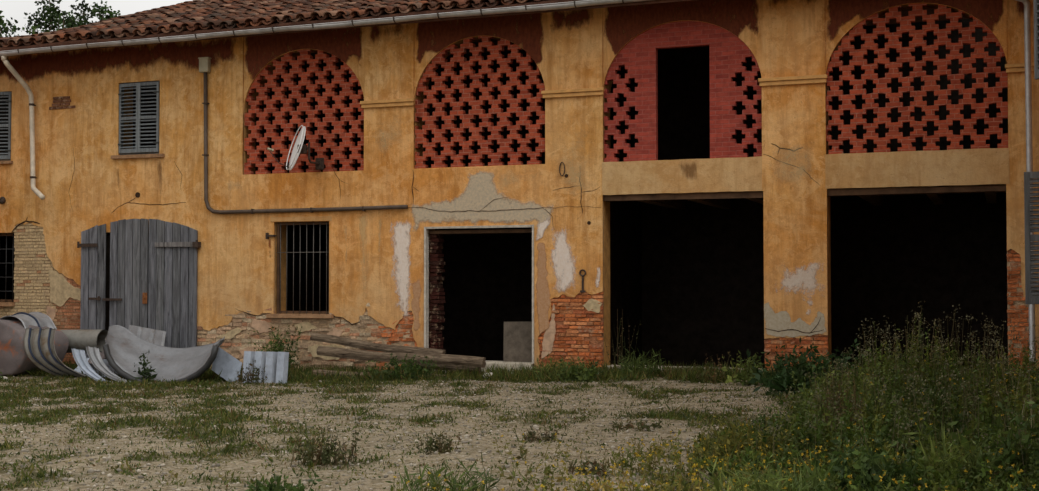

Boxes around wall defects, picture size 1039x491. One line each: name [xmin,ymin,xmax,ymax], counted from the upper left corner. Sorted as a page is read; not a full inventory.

crack [112,161,186,213]
crack [764,143,817,183]
flaking render [0,223,81,330]
flaking render [536,218,604,369]
flaking render [197,303,417,371]
flaking render [764,302,828,371]